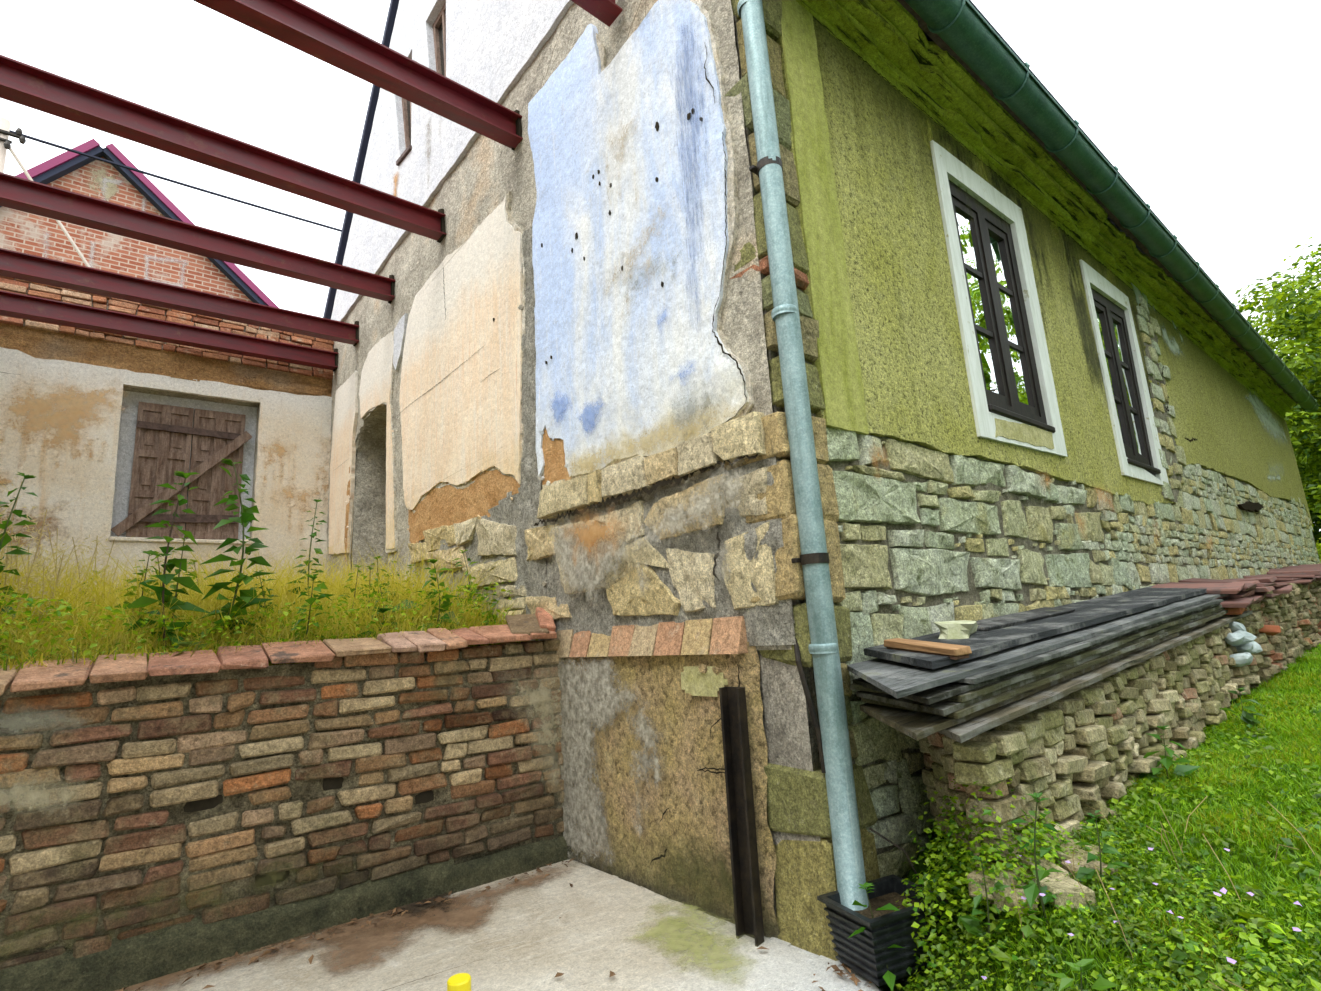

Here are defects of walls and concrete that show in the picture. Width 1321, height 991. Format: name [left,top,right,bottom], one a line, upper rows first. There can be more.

leakage [676,32,703,224]
spalling [407,226,571,544]
peeling [580,404,602,431]
leakage [1063,236,1102,387]
leakage [1131,306,1154,412]
leakage [115,868,563,991]
leakage [638,918,742,979]